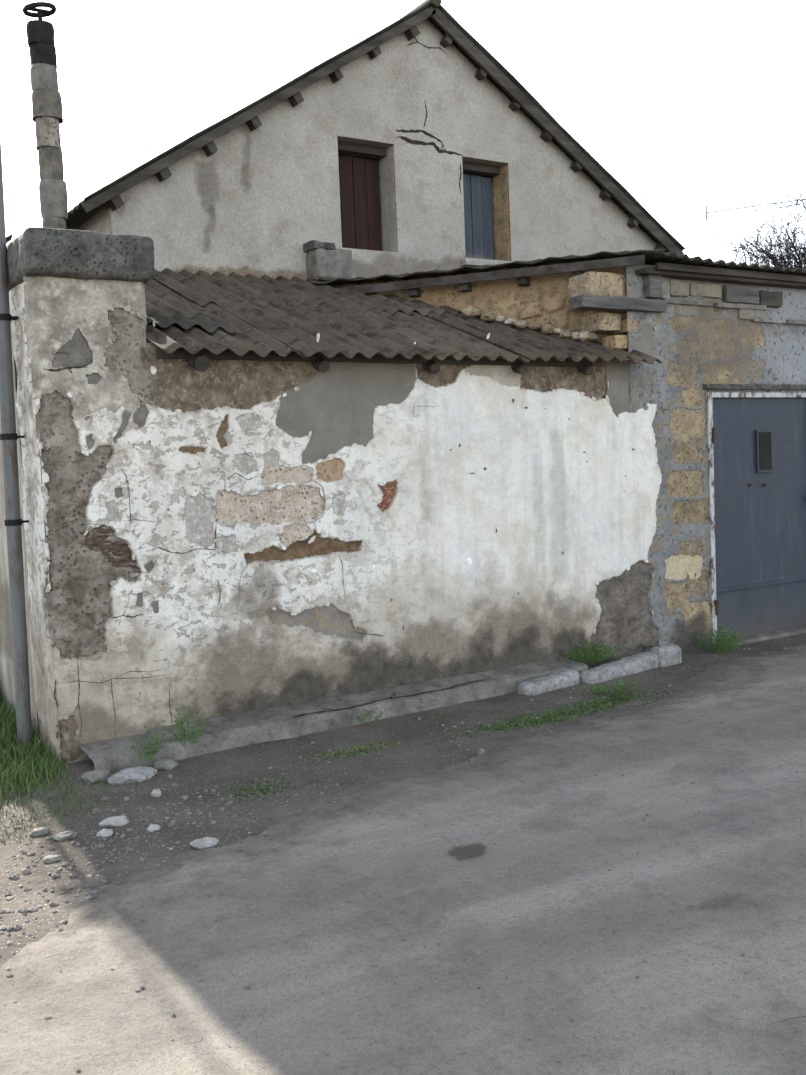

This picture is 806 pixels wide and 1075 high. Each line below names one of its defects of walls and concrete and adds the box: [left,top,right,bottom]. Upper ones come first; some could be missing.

crack [396,103,462,191]
spalling [416,356,610,409]
spalling [22,276,367,660]
flaking render [377,481,400,512]
leakage [215,608,611,717]
spalling [590,560,661,665]